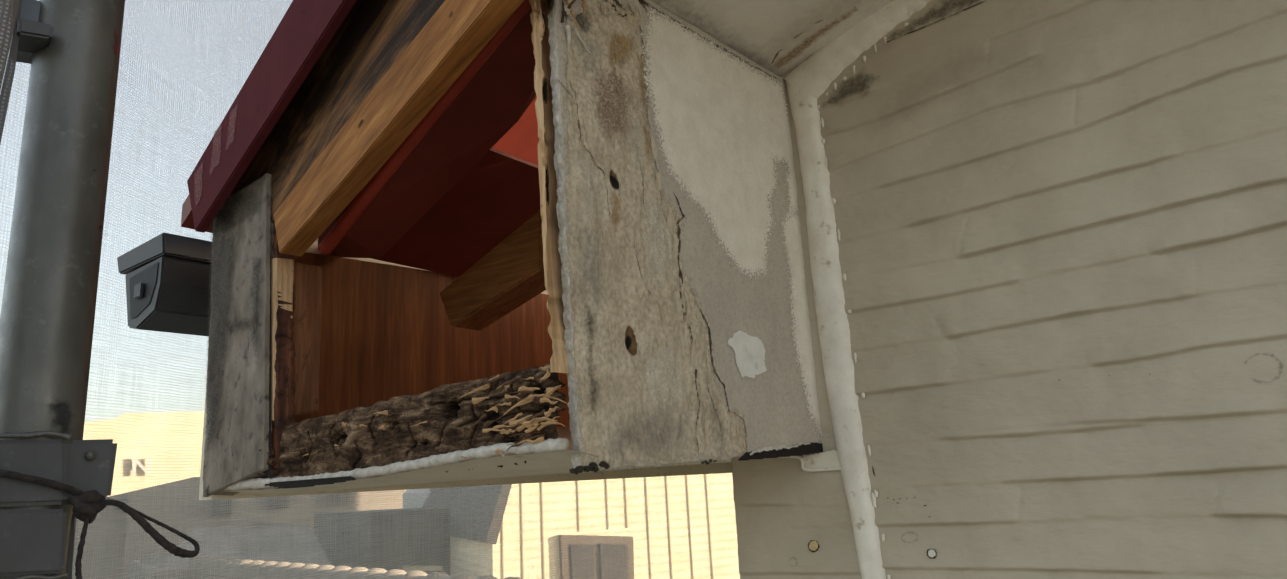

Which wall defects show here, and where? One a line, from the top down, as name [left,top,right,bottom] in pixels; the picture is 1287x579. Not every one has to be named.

crack [557,79,610,214]
peeling [562,0,822,473]
crack [628,0,823,461]